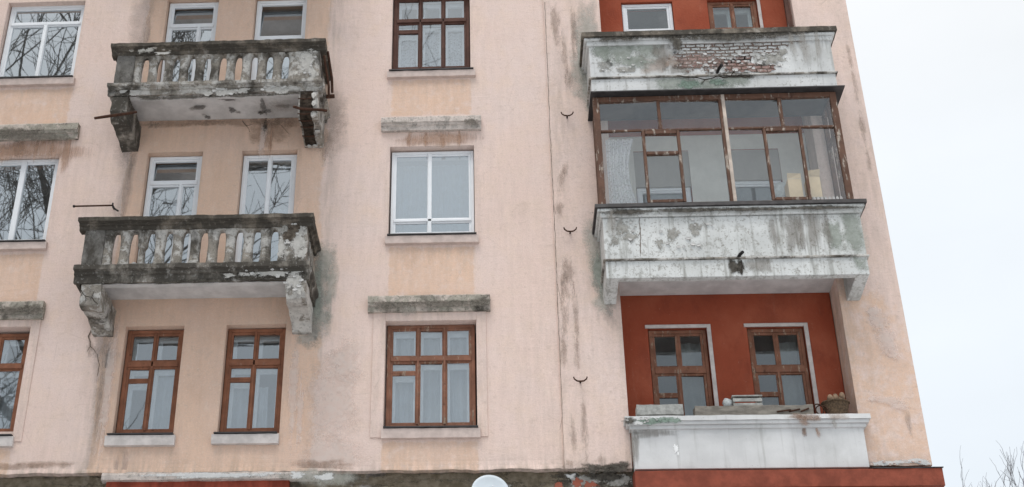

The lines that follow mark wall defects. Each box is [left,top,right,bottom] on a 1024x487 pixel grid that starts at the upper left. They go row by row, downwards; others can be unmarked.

spalling [129,47,171,55]
peeling [296,48,318,78]
flaking render [673,41,802,75]
corrosion [94,111,137,119]
spalling [119,86,320,148]
damp [825,213,866,267]
peeling [156,223,308,295]
damp [728,259,744,273]
damp [299,249,337,344]
peeling [554,471,633,487]